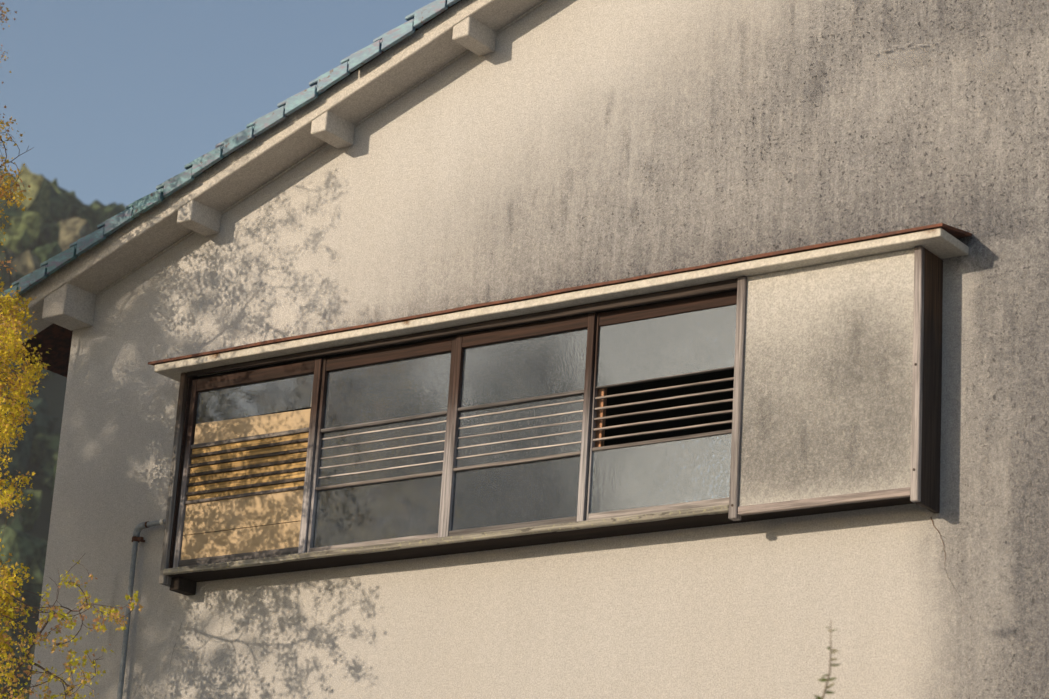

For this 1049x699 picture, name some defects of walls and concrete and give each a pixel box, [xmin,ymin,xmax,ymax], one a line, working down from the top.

damp [504,0,1049,699]